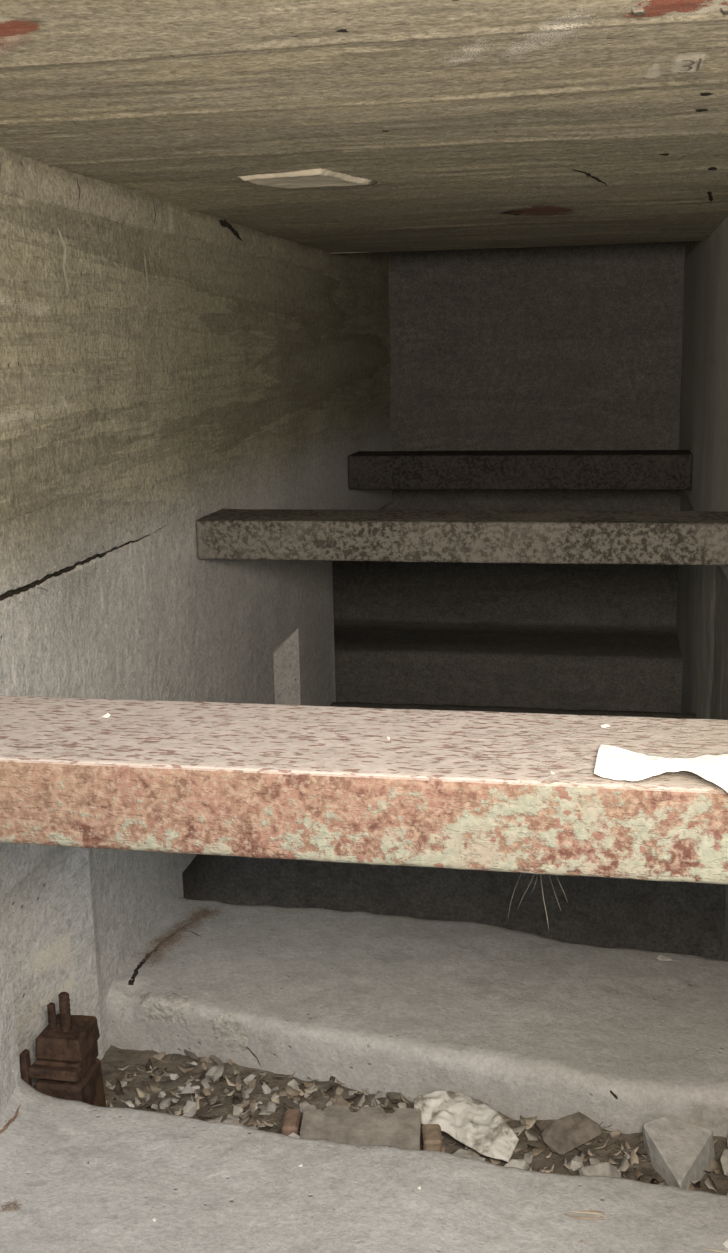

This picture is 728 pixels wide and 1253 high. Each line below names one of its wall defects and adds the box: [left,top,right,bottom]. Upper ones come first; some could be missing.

peeling [620,0,728,20]
crack [0,525,166,601]
crack [126,906,226,985]